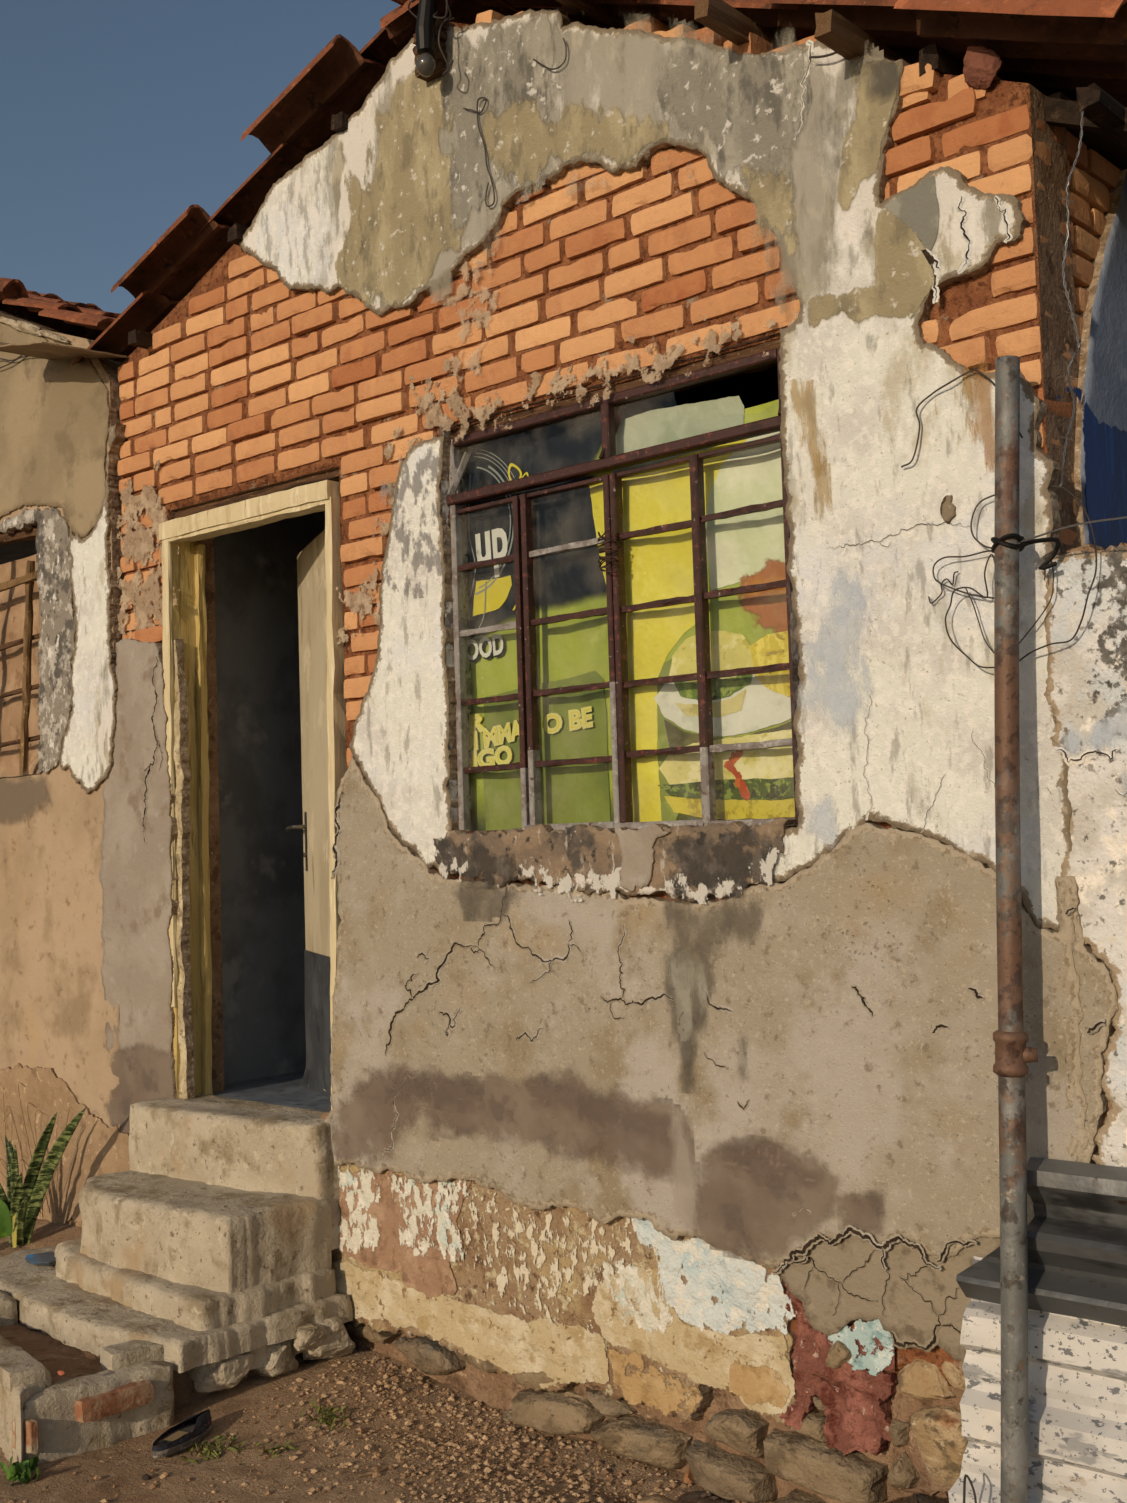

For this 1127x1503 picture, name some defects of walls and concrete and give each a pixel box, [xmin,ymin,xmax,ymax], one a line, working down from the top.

spalling [380,0,419,47]
flaking render [116,147,800,721]
crack [379,880,734,1159]
leakage [332,825,882,1259]
crack [703,1050,750,1111]
peeling [331,1166,965,1497]
crack [772,1208,1000,1363]